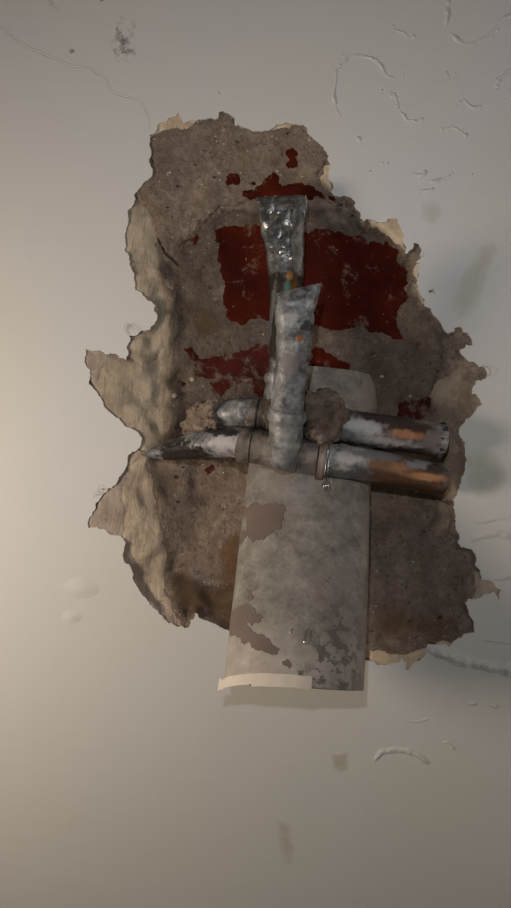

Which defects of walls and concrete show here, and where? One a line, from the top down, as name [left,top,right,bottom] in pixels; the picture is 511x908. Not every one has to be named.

spalling [85,112,501,676]